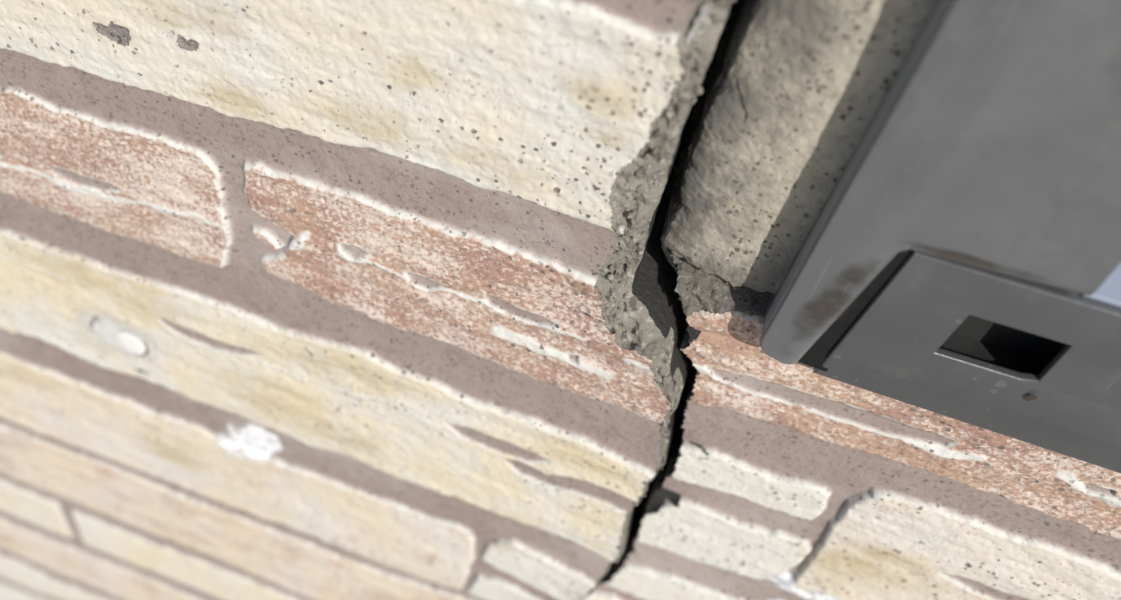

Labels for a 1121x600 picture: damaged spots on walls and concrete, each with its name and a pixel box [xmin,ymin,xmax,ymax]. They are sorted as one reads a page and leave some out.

peeling [177,36,199,52]
crack [550,0,771,600]